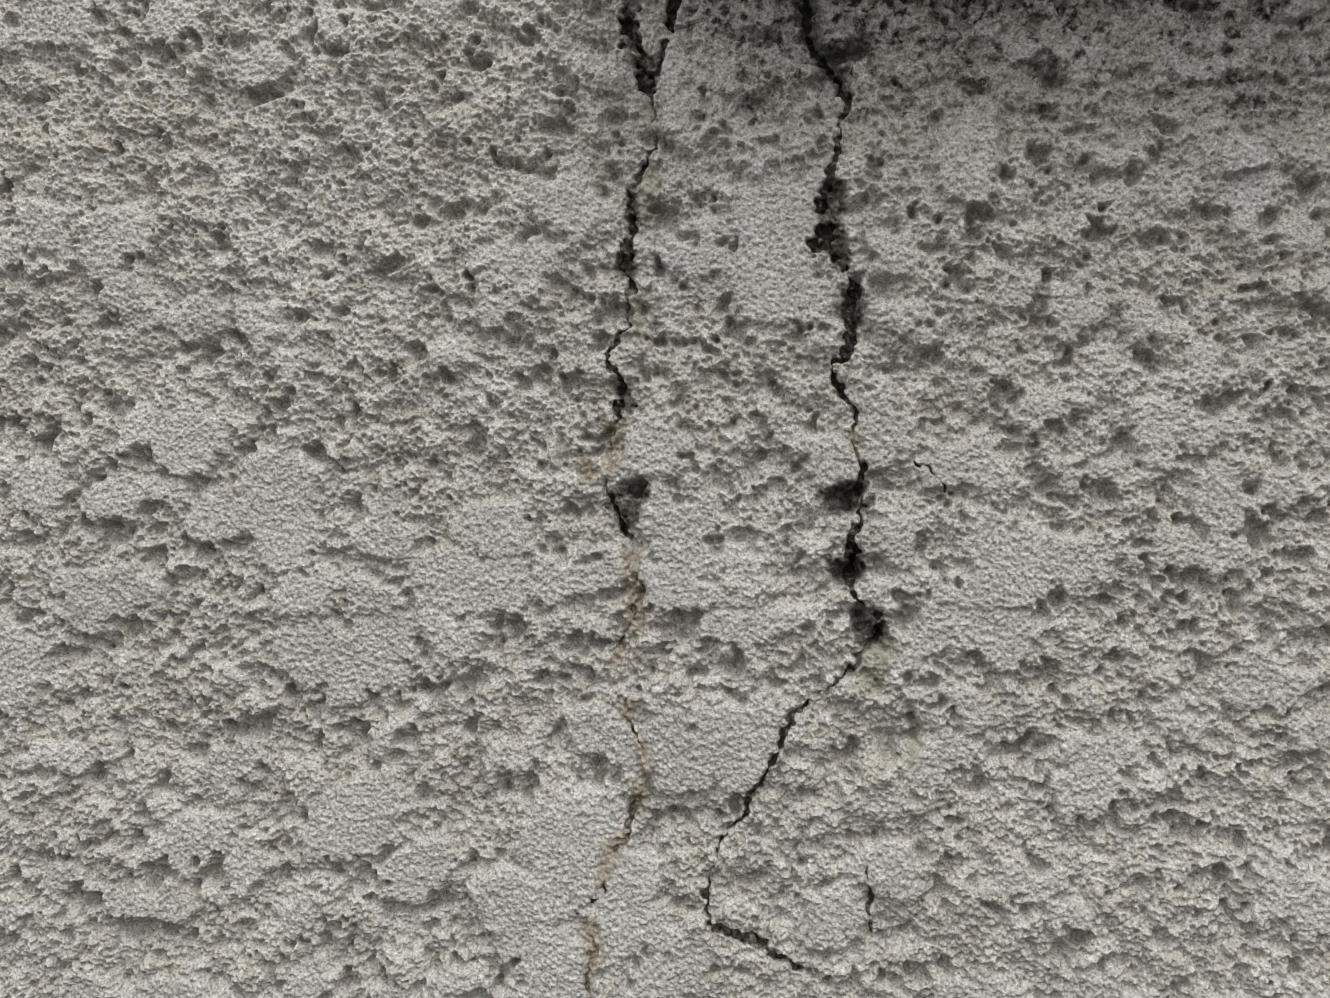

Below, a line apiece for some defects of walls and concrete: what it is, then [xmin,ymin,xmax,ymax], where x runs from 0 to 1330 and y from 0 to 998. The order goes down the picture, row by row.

crack [604,0,682,434]
crack [605,480,634,540]
crack [700,1,878,979]
crack [619,579,646,650]
crack [614,795,641,853]
crack [577,883,606,993]